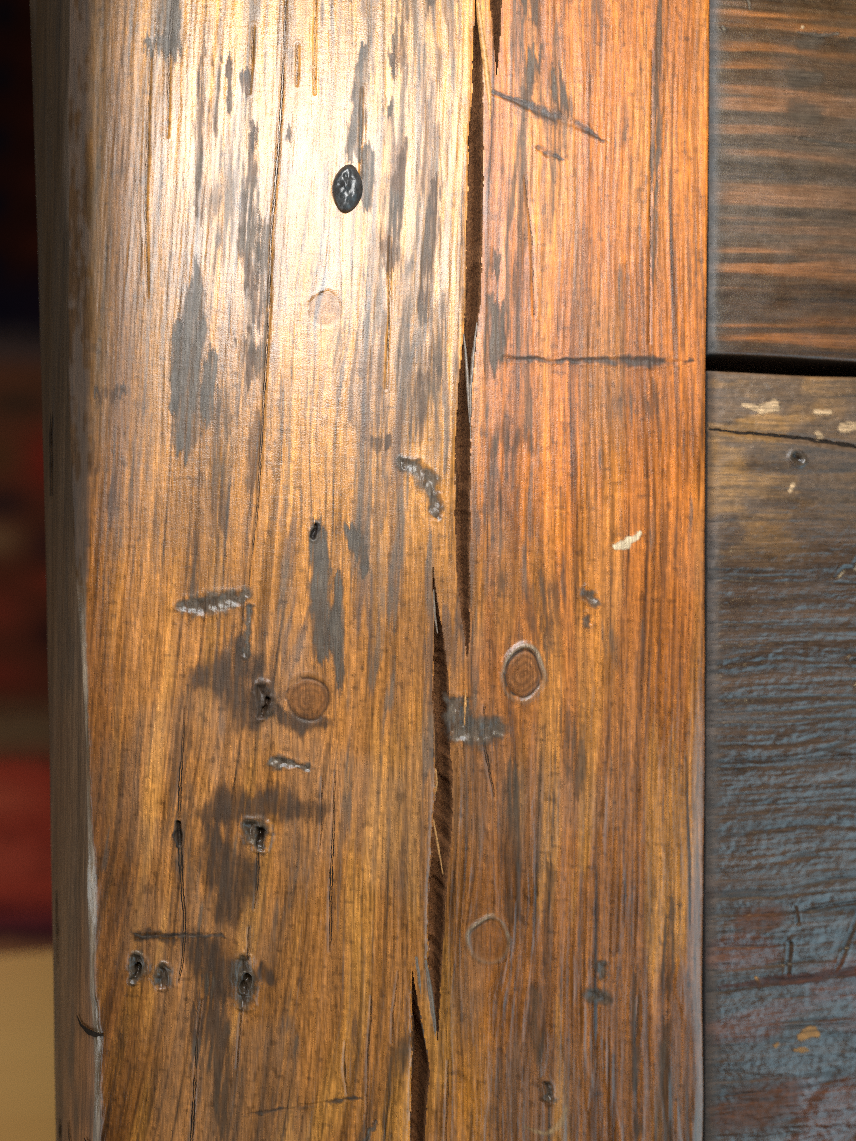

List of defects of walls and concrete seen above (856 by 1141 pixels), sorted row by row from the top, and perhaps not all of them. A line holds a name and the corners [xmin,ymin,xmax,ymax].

crack [524,178,535,315]
crack [646,58,654,343]
crack [344,0,502,1141]